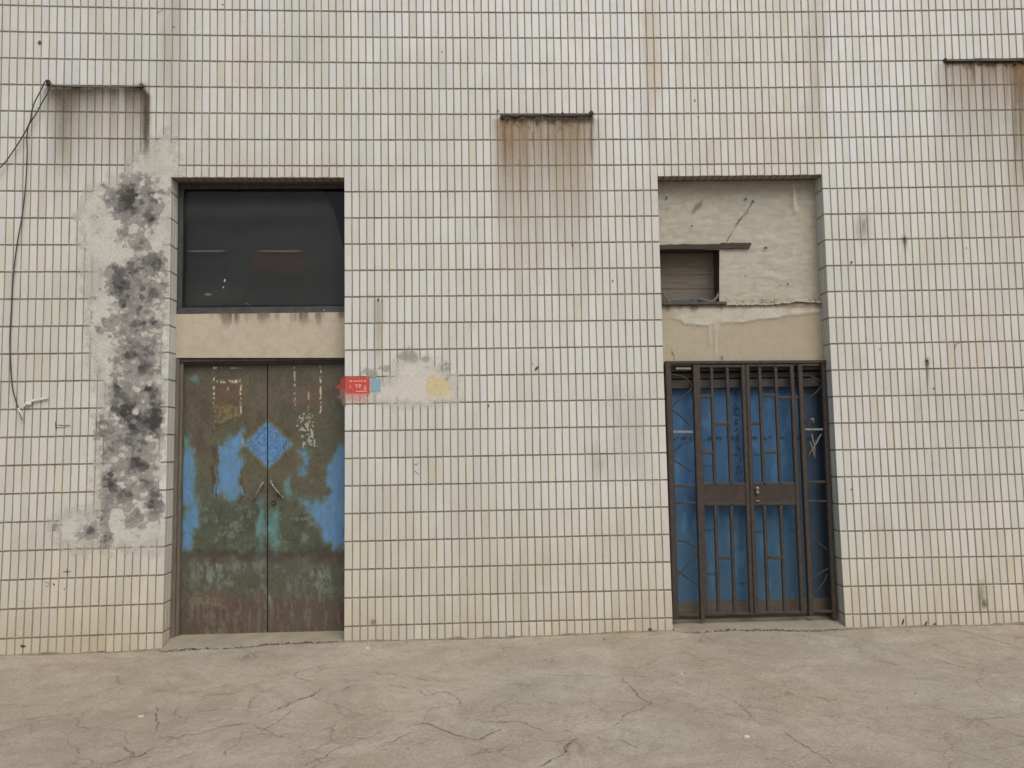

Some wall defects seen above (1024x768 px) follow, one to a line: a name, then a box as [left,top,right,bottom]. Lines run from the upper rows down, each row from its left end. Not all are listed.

rust [945,61,1024,104]
rust [498,116,593,167]
leakage [49,87,183,557]